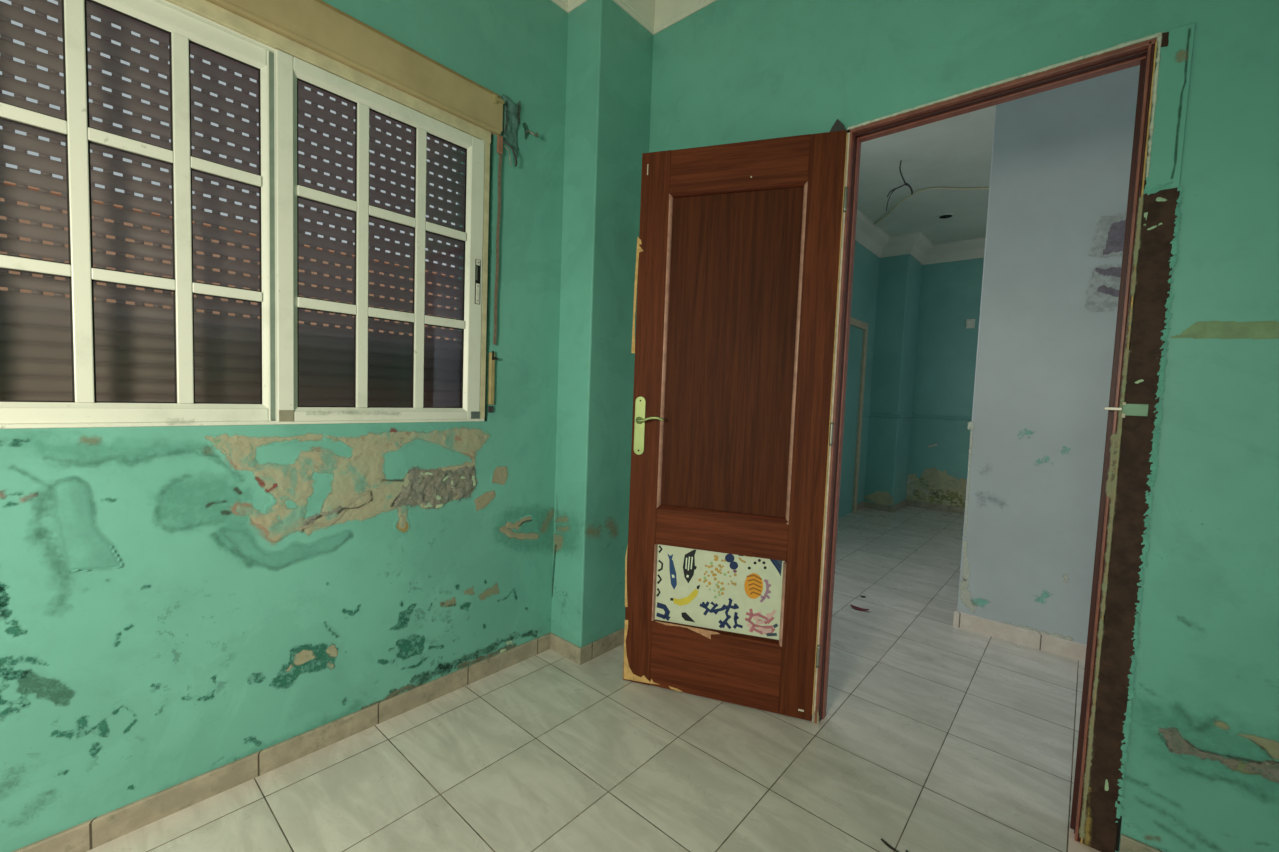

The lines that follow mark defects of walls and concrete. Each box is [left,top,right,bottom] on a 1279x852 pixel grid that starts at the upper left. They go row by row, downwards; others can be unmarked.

peeling [202,425,510,546]
spalling [499,514,539,540]
peeling [906,422,988,611]
peeling [0,584,27,636]
peeling [0,656,73,716]
peeling [250,622,338,688]
spalling [362,580,537,709]
peeling [52,708,120,757]
peeling [1159,721,1279,783]